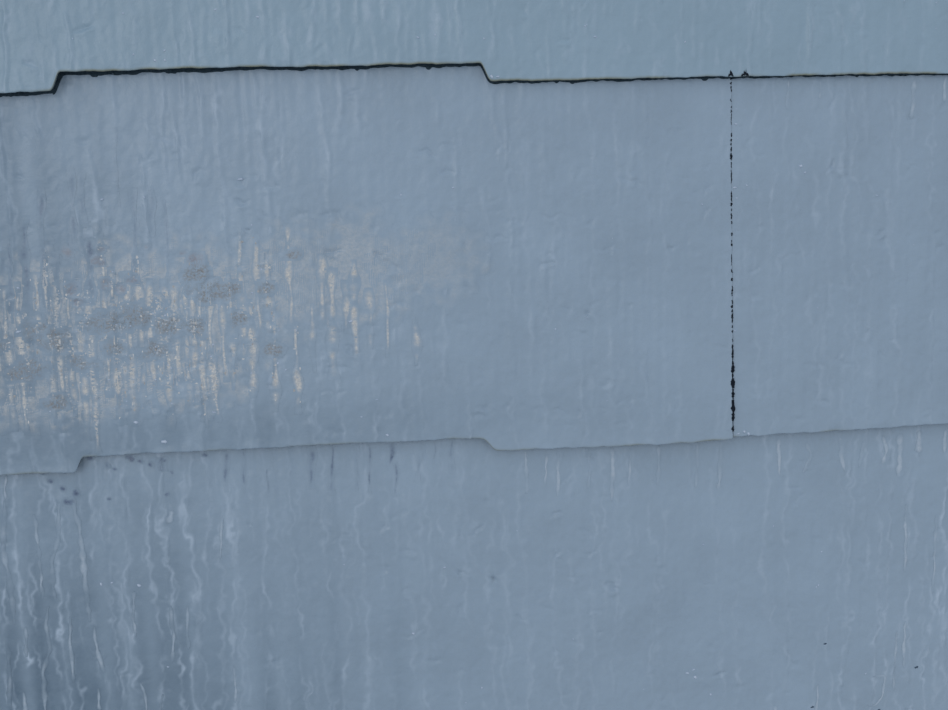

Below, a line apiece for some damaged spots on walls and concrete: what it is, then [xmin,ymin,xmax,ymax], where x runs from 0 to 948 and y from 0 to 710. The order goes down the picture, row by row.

crack [728,77,736,431]